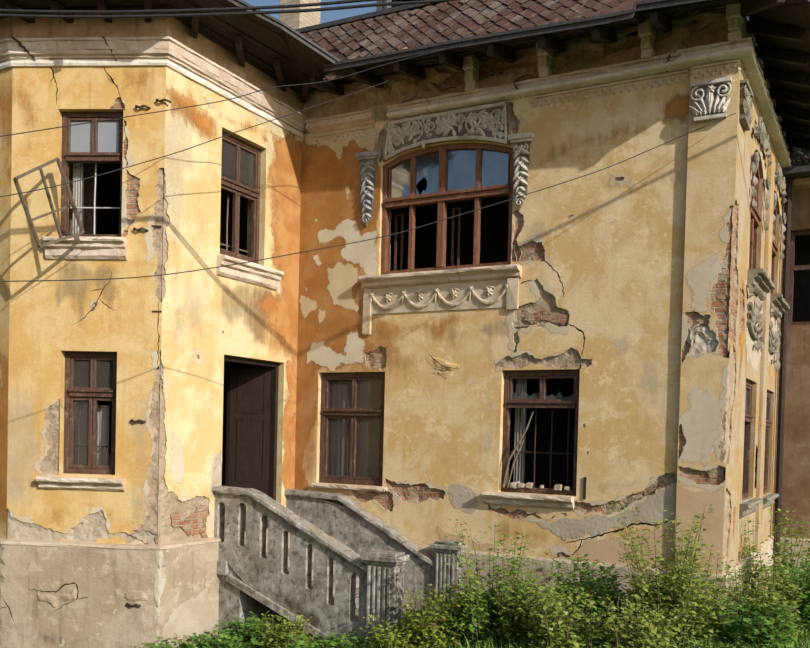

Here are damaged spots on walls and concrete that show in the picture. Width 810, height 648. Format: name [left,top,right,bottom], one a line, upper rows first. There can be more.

crack [11,36,58,104]
crack [102,36,121,97]
spalling [121,120,141,237]
crack [74,271,117,324]
spalling [144,168,170,303]
peeling [299,287,326,329]
peeling [313,219,378,312]
peeling [307,332,388,371]
peeling [488,200,779,559]
spalling [7,348,222,622]
spalling [352,479,448,512]
crack [29,582,88,609]